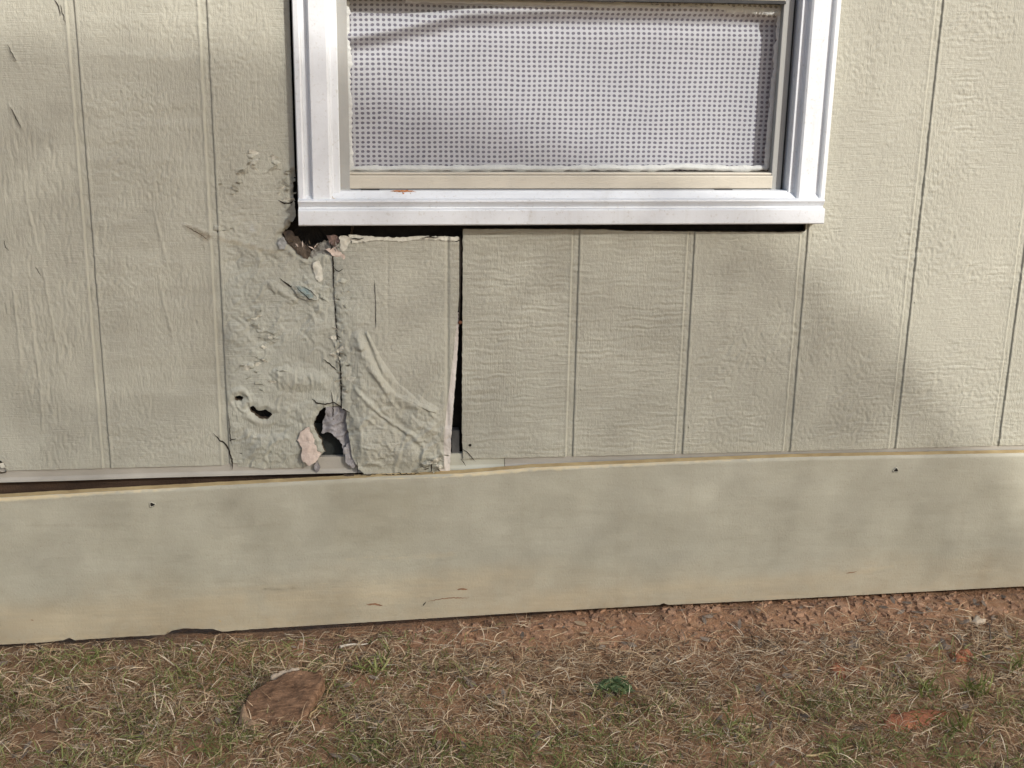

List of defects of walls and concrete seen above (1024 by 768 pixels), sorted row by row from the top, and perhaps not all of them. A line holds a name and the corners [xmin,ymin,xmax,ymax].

peeling [219,144,459,282]
peeling [235,310,287,391]
crack [312,256,350,420]
peeling [297,427,321,466]